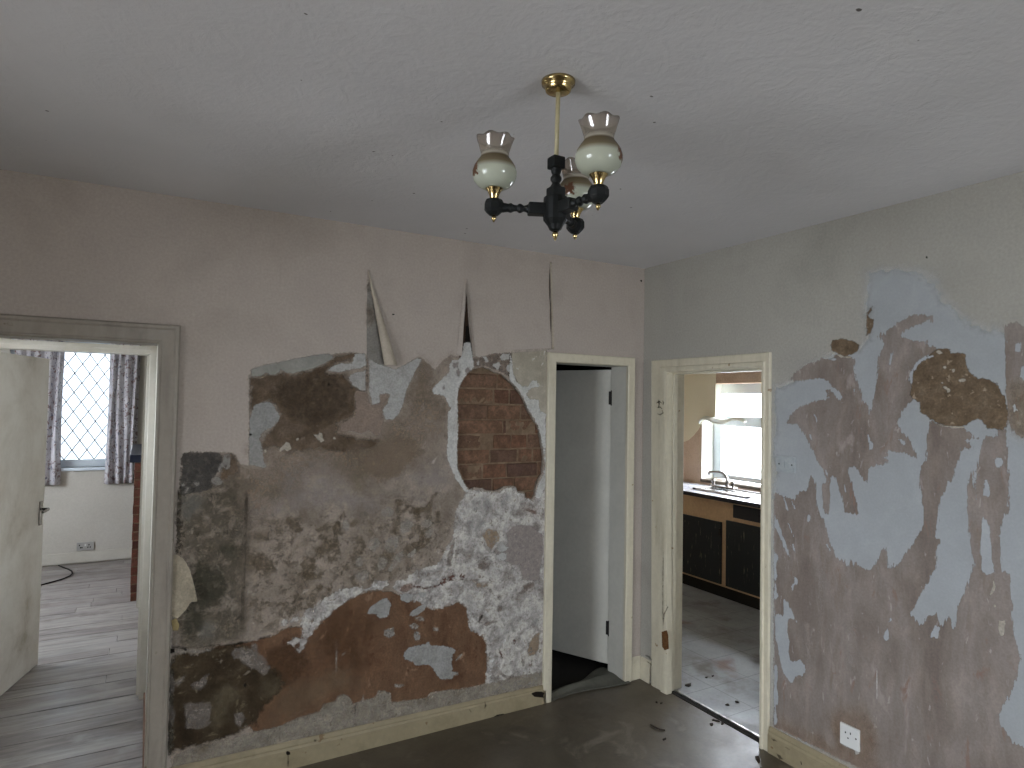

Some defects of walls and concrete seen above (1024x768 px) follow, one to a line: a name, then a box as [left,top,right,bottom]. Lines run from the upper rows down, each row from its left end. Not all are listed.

spalling [909,348,1018,430]
water stain [168,353,445,751]
flaking render [215,342,546,732]
peeling [773,552,806,725]
peeling [980,517,994,575]